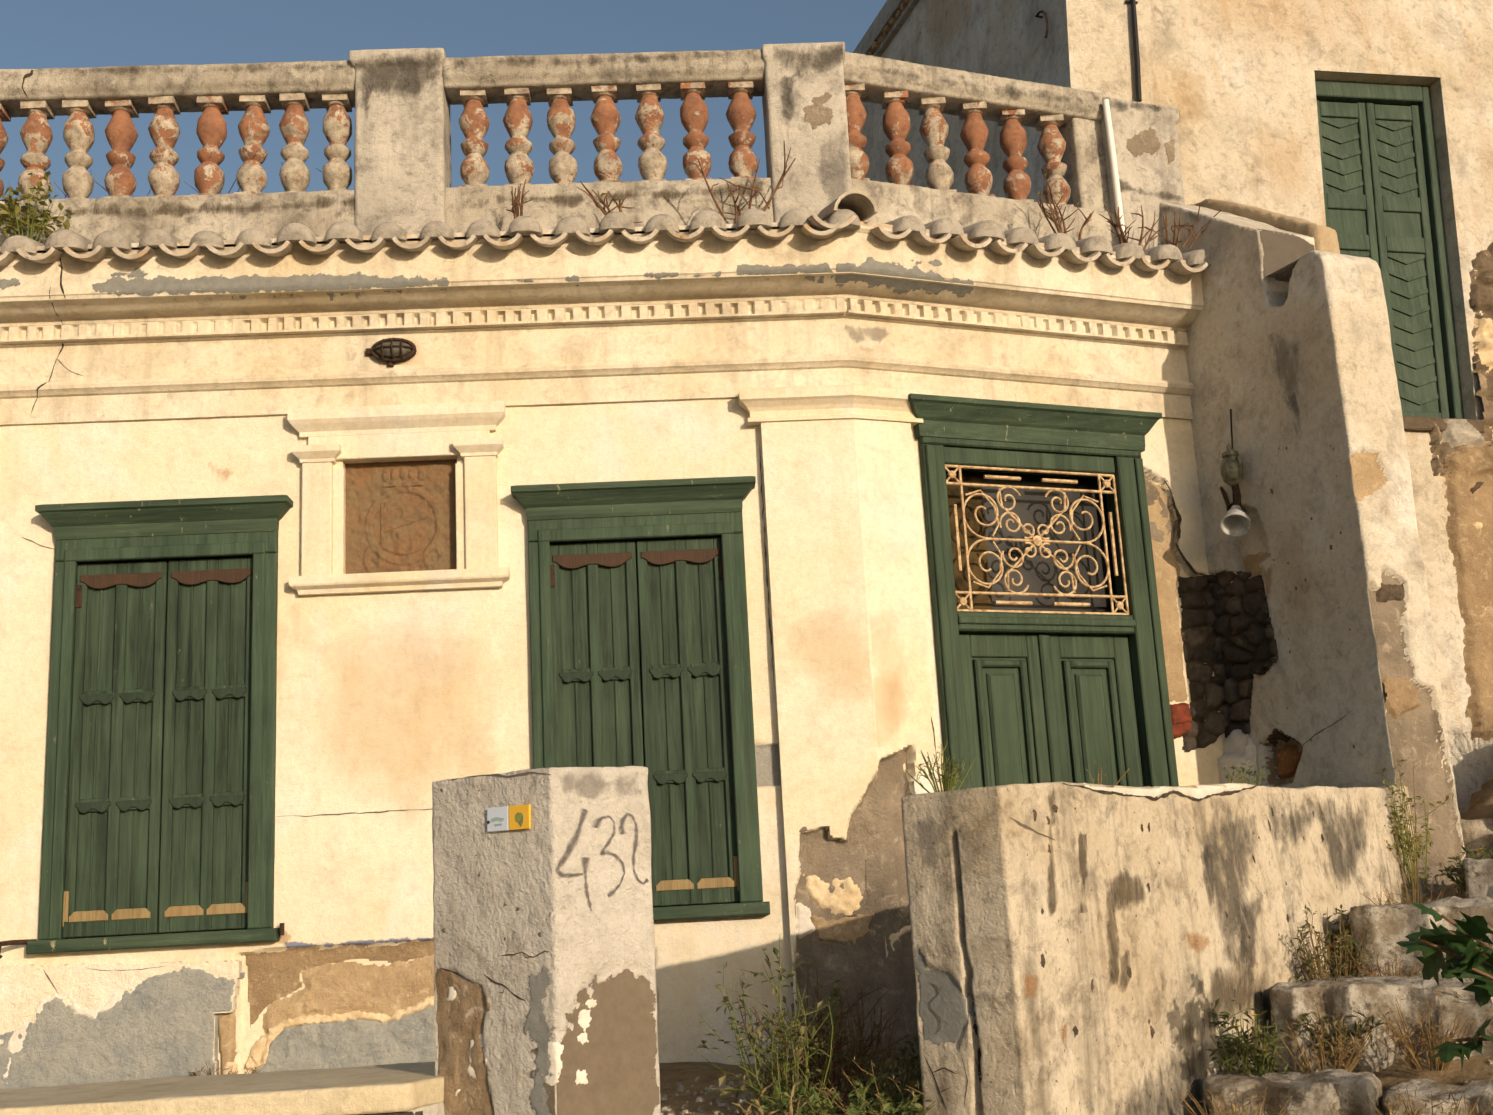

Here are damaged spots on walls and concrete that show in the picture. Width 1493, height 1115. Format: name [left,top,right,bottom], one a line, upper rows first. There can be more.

flaking render [523,966,660,1115]
spalling [791,745,976,1064]